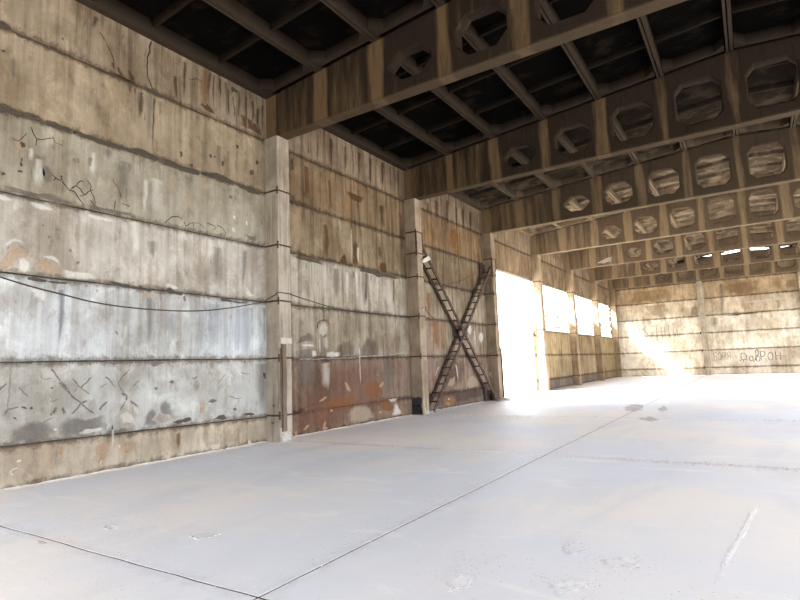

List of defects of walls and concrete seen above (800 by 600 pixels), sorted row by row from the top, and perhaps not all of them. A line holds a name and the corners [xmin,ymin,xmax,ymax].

crack [81,6,153,89]
crack [12,127,63,146]
crack [52,174,130,211]
crack [165,216,226,238]
peeling [0,242,29,271]
damp [18,257,30,273]
damp [43,255,99,347]
damp [140,293,158,349]
damp [196,303,267,351]
crack [39,367,139,427]
rust [294,361,393,435]